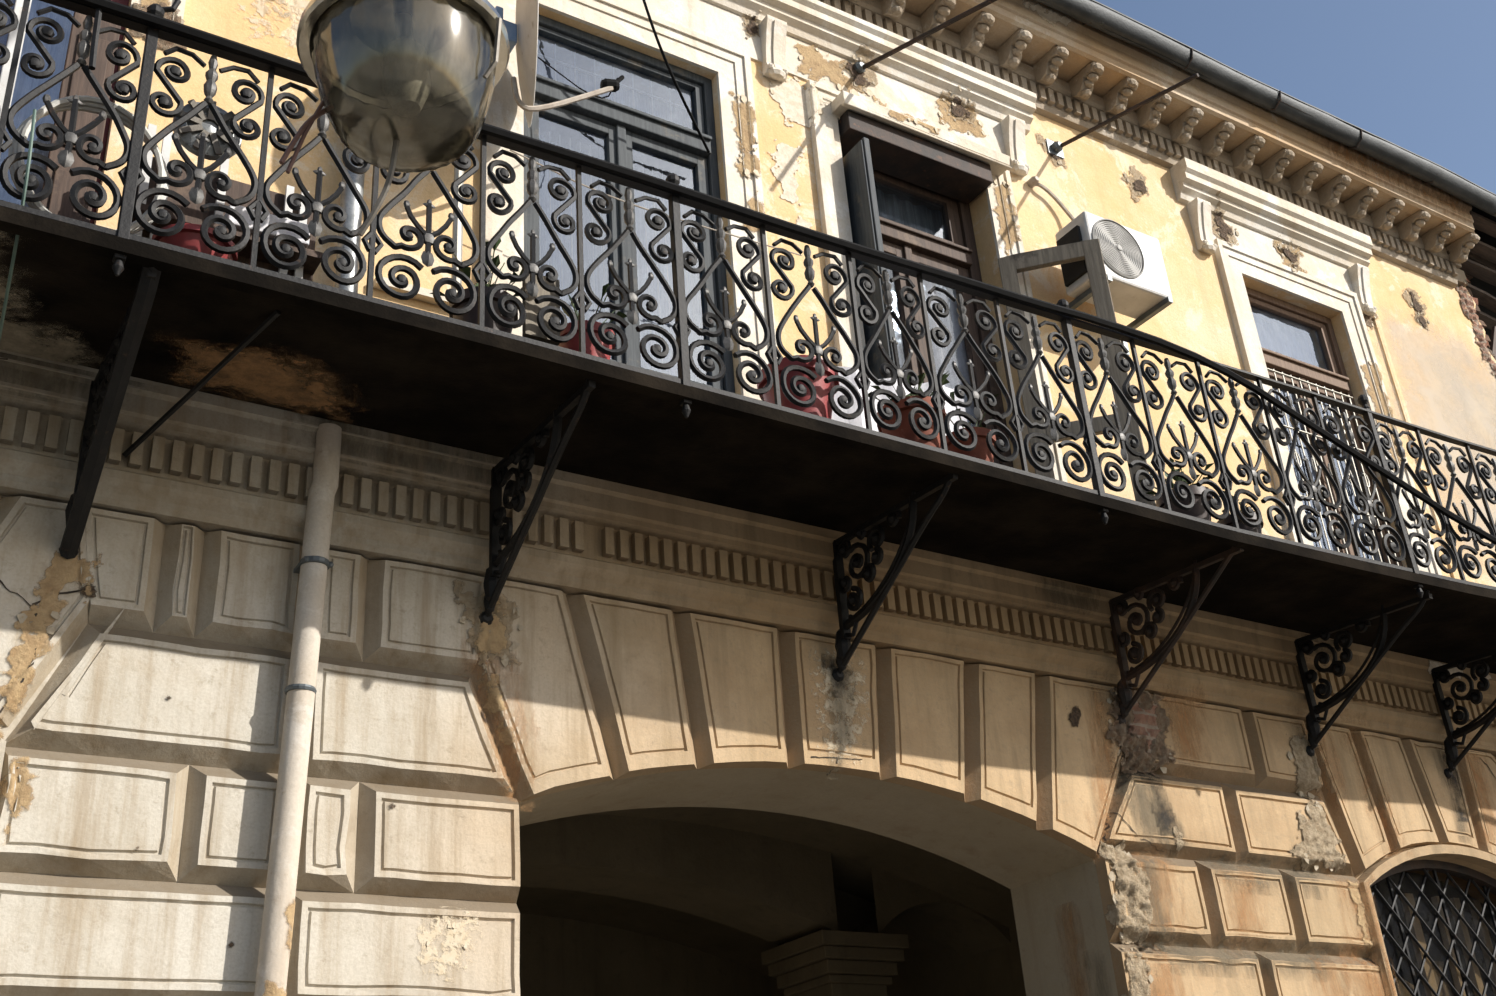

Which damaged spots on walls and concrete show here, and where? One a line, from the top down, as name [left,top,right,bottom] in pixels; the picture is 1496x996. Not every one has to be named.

spalling [123,30,187,50]
spalling [132,0,185,24]
peeling [729,44,987,232]
crack [0,580,85,713]
flaking render [0,551,103,740]
spalling [453,579,523,685]
spalling [1106,685,1176,777]
leakage [1119,768,1181,843]
flaking render [1287,735,1346,872]
peeling [417,906,481,982]
spalling [1097,839,1154,996]